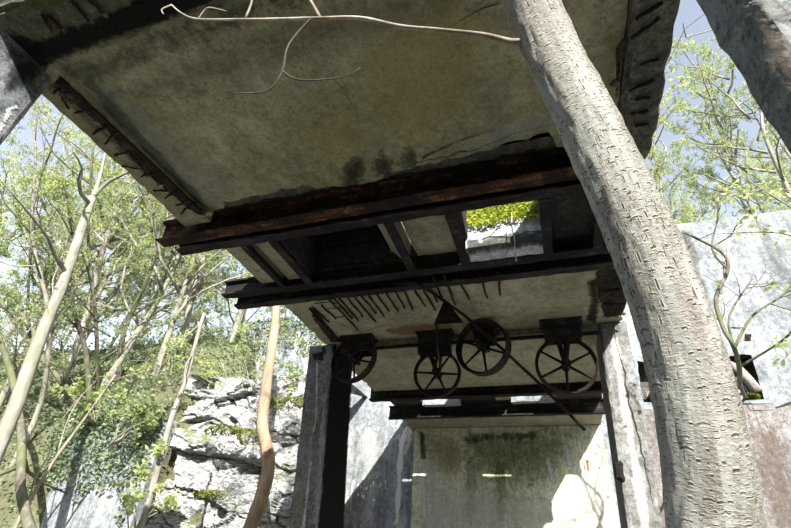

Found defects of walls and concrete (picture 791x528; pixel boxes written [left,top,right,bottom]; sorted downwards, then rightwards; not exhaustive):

damp [6,0,254,90]
spalling [610,1,663,98]
spalling [48,76,213,217]
spalling [629,79,655,128]
spalling [309,274,456,361]
damp [470,430,609,524]